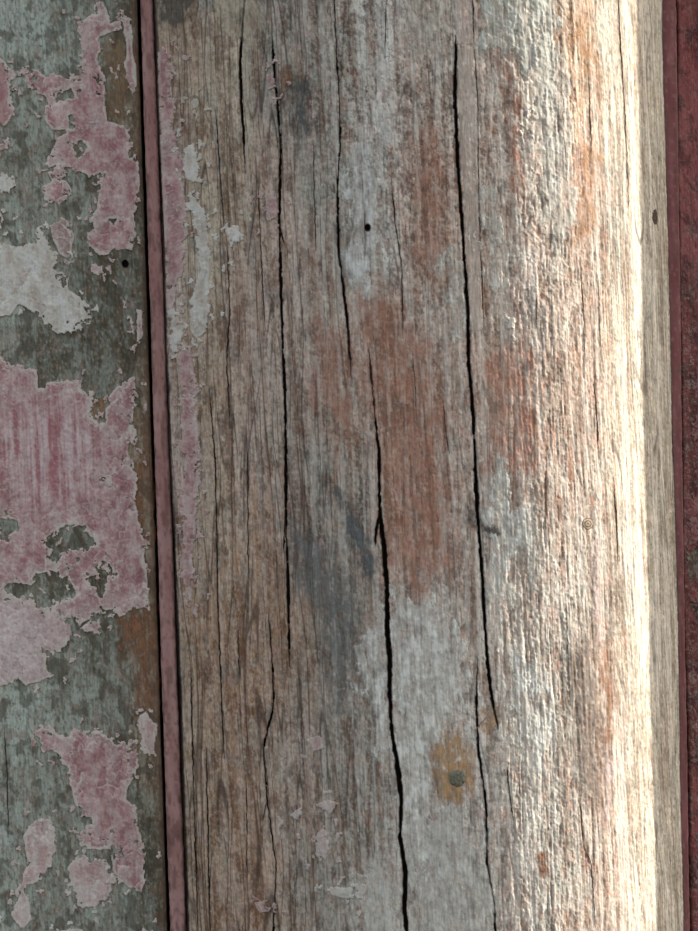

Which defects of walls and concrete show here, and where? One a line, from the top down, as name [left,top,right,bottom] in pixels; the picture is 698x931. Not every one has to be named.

peeling [0,0,141,334]
peeling [0,352,151,694]
peeling [123,300,144,353]
peeling [157,40,292,618]
crack [313,0,408,931]
crack [453,1,499,931]
peeling [0,708,161,931]
rust [430,733,473,804]